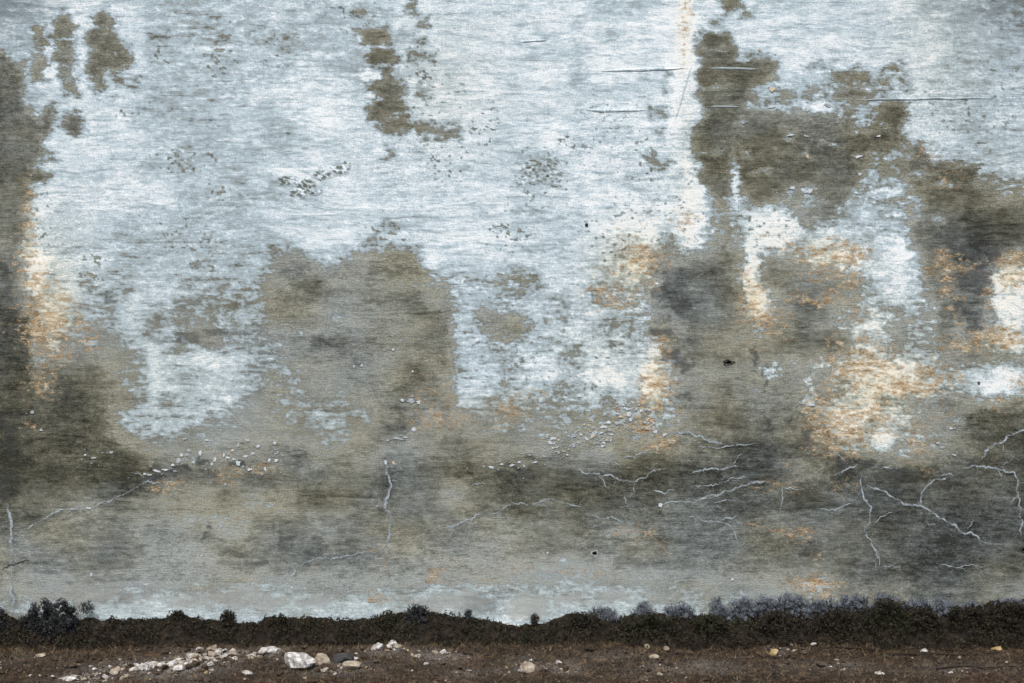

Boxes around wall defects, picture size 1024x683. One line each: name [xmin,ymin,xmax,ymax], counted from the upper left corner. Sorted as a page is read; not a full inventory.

rust [800,336,962,459]
water stain [141,457,205,483]
crack [284,466,402,578]
crack [441,429,1024,575]
efflorescence [399,588,581,617]